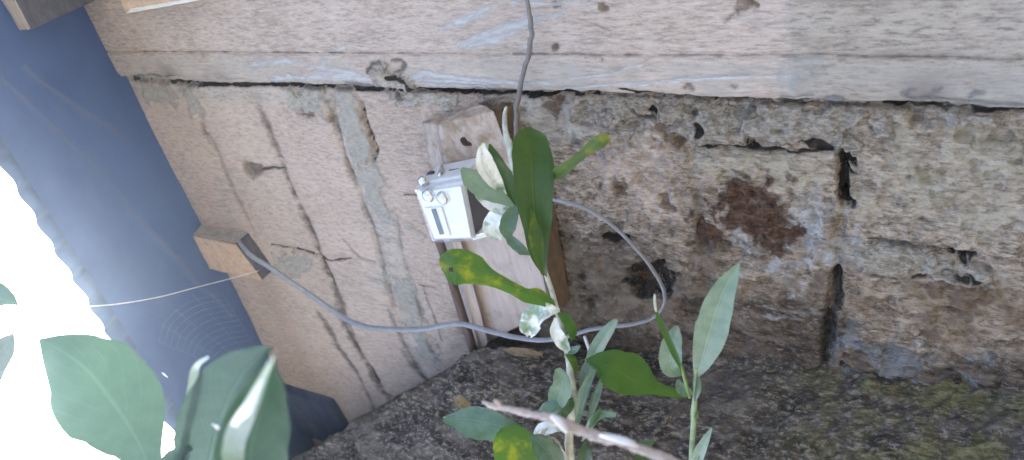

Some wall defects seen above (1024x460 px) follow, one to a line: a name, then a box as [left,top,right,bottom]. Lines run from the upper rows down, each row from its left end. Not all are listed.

crack [133,51,687,162]
crack [863,100,1024,113]
crack [262,122,285,170]
crack [698,138,857,208]
corrosion [687,169,816,257]
leakage [487,327,519,349]
leakage [551,218,748,353]
crack [821,263,856,372]
spalling [837,238,993,288]